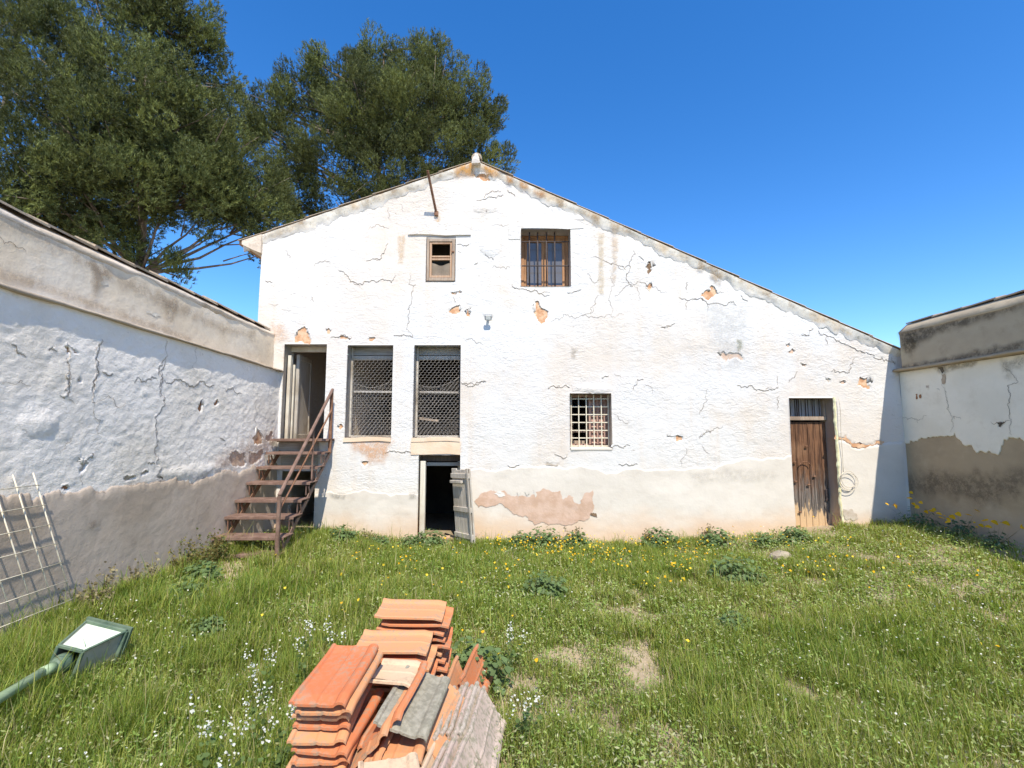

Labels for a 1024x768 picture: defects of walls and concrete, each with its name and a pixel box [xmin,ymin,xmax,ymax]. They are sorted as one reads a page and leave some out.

crack [314,204,415,337]
peeling [449,289,472,318]
peeling [533,300,549,324]
crack [457,243,748,328]
peeling [701,284,718,300]
peeling [295,325,311,345]
peeling [716,350,743,361]
peeling [825,376,873,389]
crack [10,339,258,482]
peeling [228,426,274,467]
peeling [834,435,884,448]
peeling [474,488,597,526]